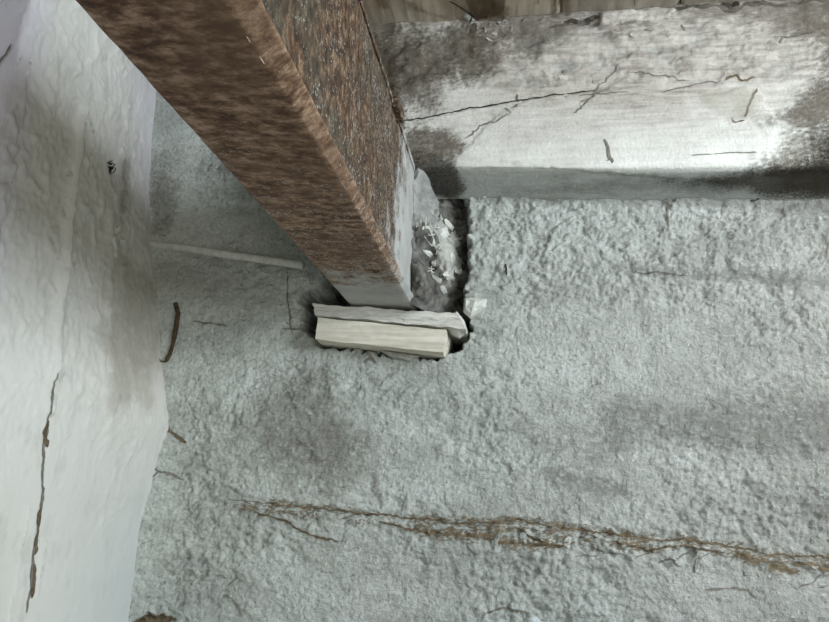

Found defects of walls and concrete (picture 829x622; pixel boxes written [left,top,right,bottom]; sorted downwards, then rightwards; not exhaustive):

damp [467,0,509,22]
crack [405,63,758,139]
crack [604,139,614,163]
crack [694,149,754,157]
damp [667,123,829,200]
spalling [410,168,470,324]
crack [7,362,65,622]
crack [225,499,829,598]